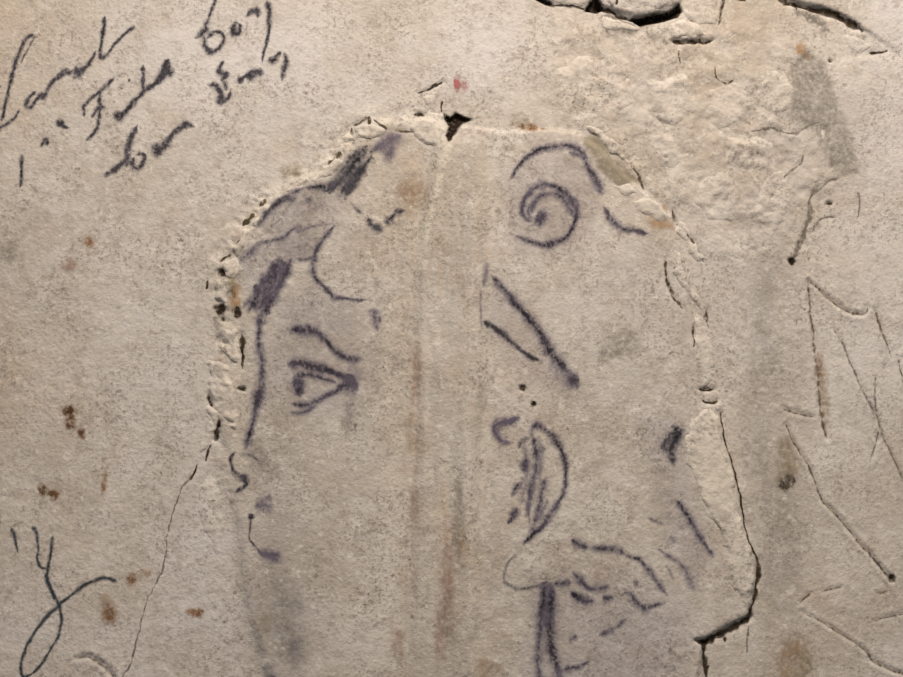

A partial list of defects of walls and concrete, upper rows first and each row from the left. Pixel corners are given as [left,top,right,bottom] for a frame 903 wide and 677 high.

flaking render [602,0,671,34]
flaking render [669,0,718,40]
crack [239,335,247,368]
corrosion [63,405,85,439]
crack [122,394,221,677]
crack [696,388,761,677]